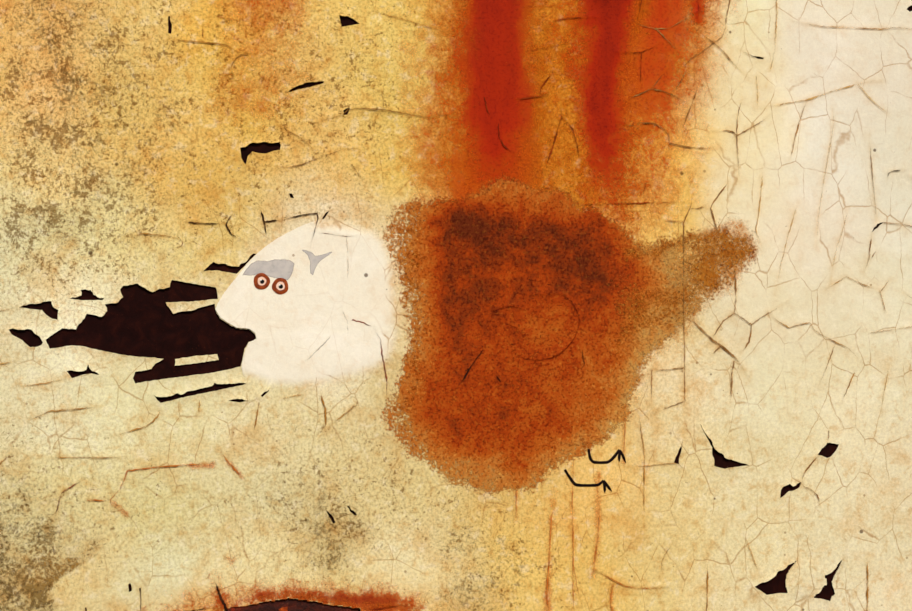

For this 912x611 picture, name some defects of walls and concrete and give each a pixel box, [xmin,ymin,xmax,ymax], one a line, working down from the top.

peeling [240,139,282,164]
crack [629,0,756,149]
crack [725,95,762,152]
crack [781,85,875,105]
corrosion [381,0,755,495]
crack [613,185,808,408]
peeling [9,280,256,403]
crack [624,405,676,503]
peeling [701,425,747,469]
corrosion [173,581,424,611]
peeling [755,561,796,595]
peeling [814,560,842,601]